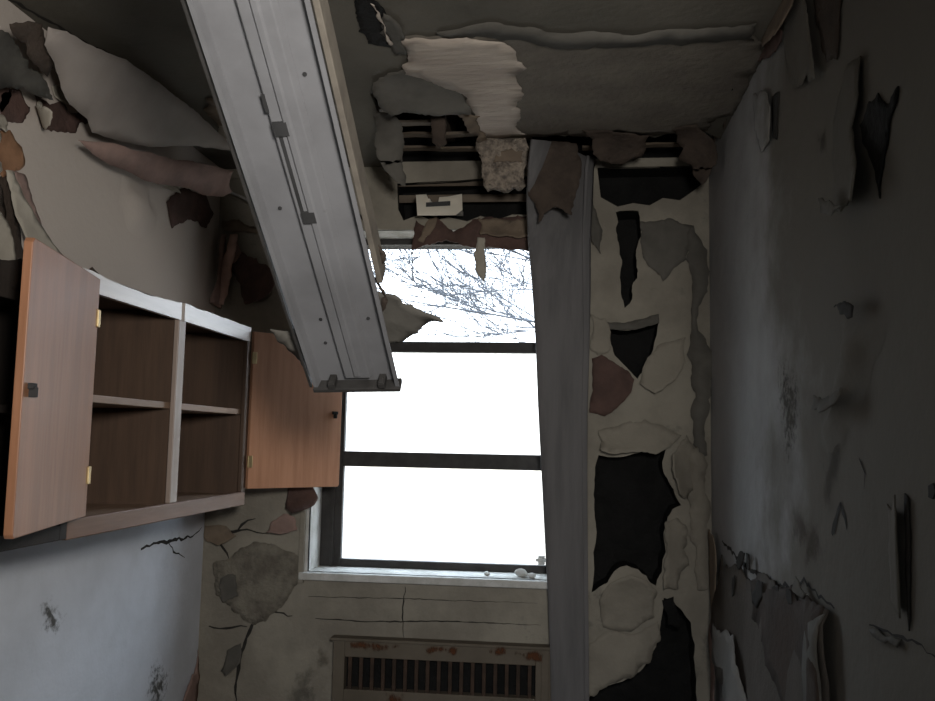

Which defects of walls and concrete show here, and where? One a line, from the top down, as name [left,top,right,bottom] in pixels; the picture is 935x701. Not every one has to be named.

peeling [0,21,275,305]
flaking render [372,0,899,701]
crack [209,624,253,701]
spalling [886,493,911,631]